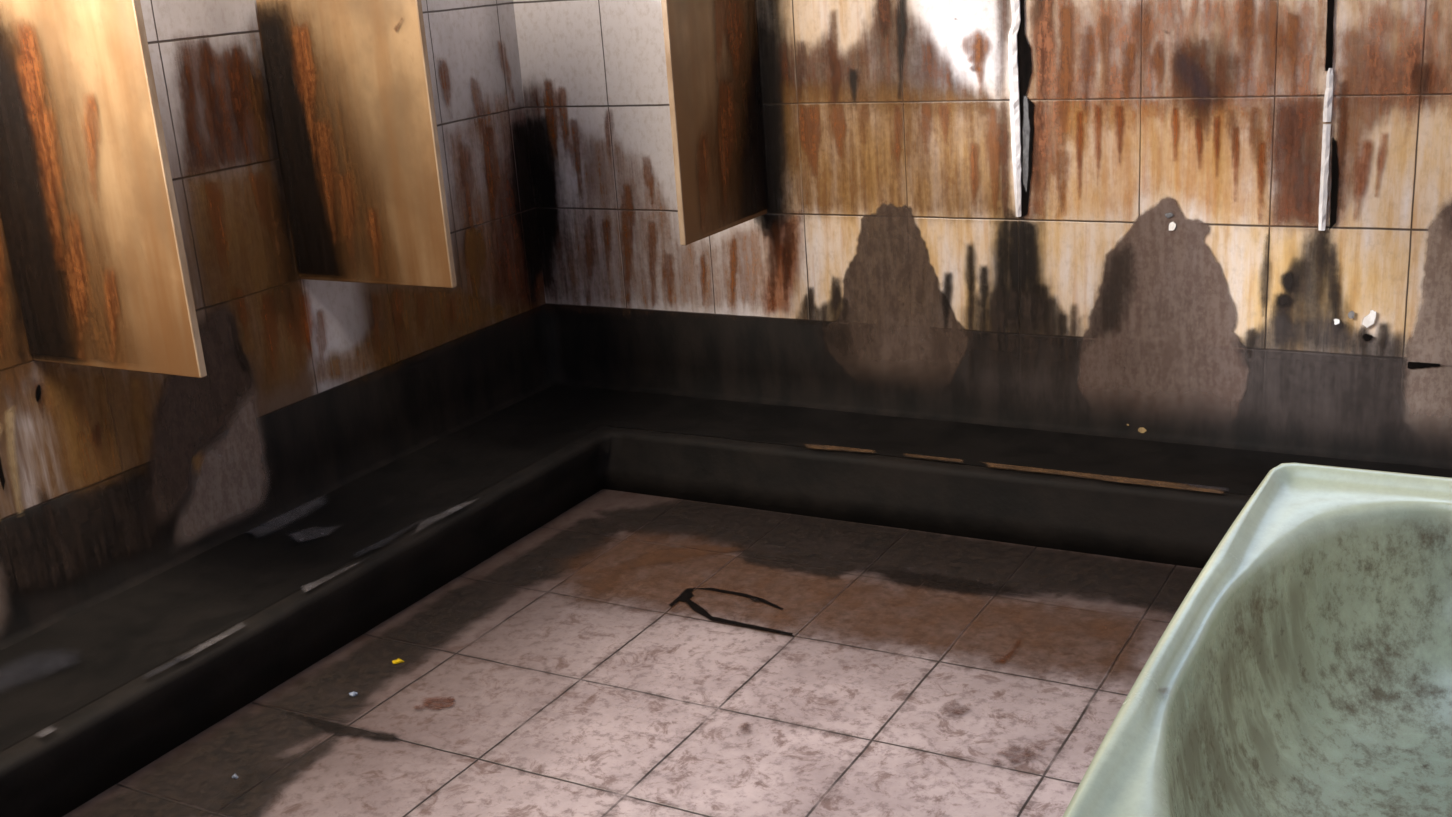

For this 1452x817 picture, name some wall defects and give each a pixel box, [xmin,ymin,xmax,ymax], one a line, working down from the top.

rust [178,40,263,172]
rust [440,61,450,104]
rust [1030,0,1452,225]
water stain [806,197,1255,409]